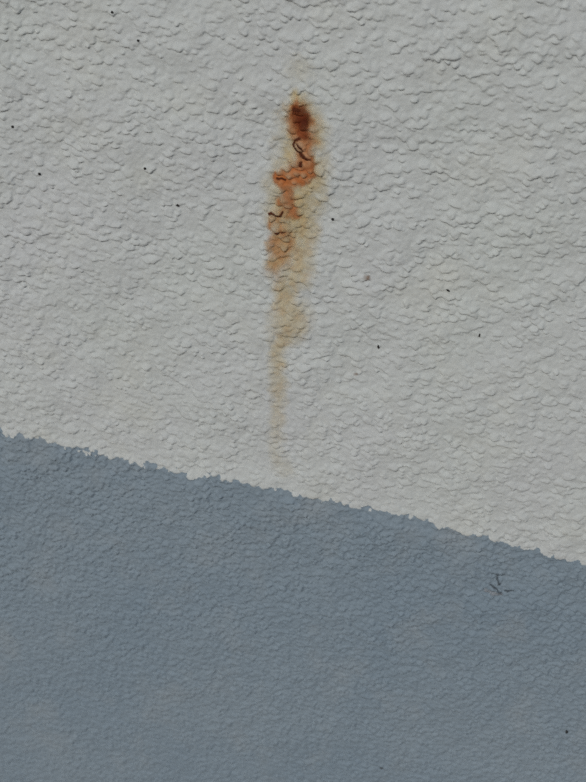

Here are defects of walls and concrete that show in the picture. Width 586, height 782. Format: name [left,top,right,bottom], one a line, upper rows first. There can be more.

rust [268,91,322,347]